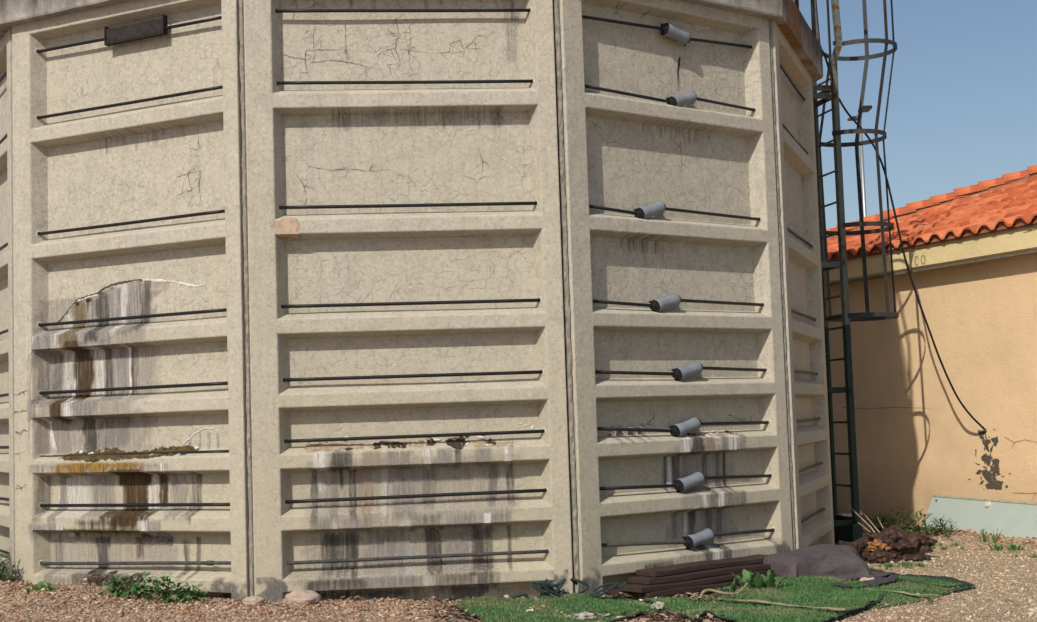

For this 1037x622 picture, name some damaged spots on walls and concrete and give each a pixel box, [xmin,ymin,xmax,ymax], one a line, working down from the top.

crack [283,0,481,78]
spalling [58,278,203,322]
leakage [27,281,159,454]
spalling [303,436,514,453]
peeling [968,429,1011,490]
leakage [297,446,514,600]
leakage [664,435,746,560]
leakage [55,534,201,585]
leakage [211,578,287,602]